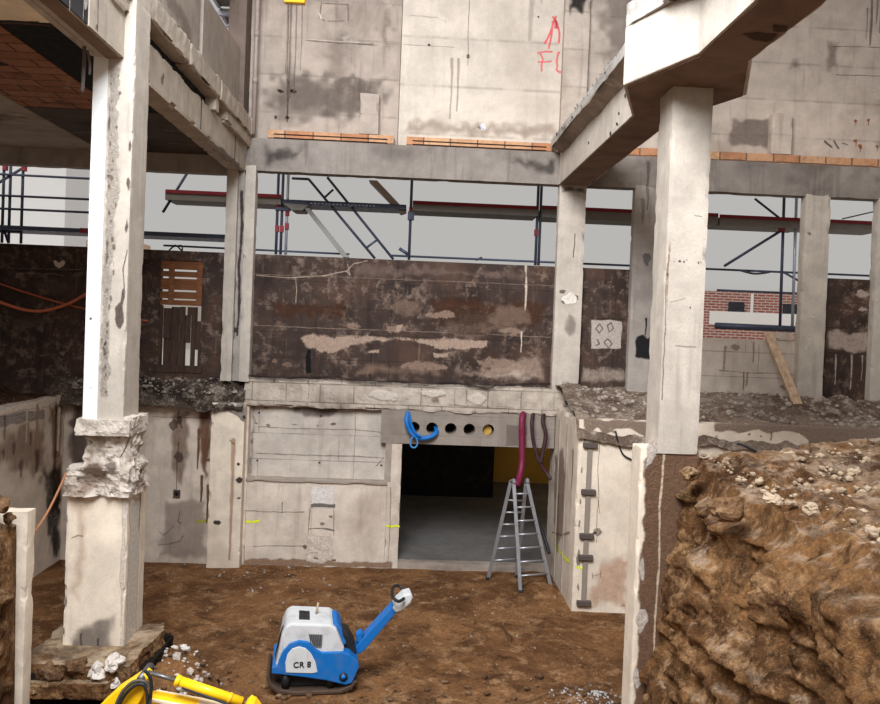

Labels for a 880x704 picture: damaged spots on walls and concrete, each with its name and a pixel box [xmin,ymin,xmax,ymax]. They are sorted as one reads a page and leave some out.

spalling [100,67,130,395]
peeling [301,323,515,371]
peeling [425,310,455,319]
peeling [499,327,523,336]
leakage [173,415,188,479]
spalling [0,395,171,645]